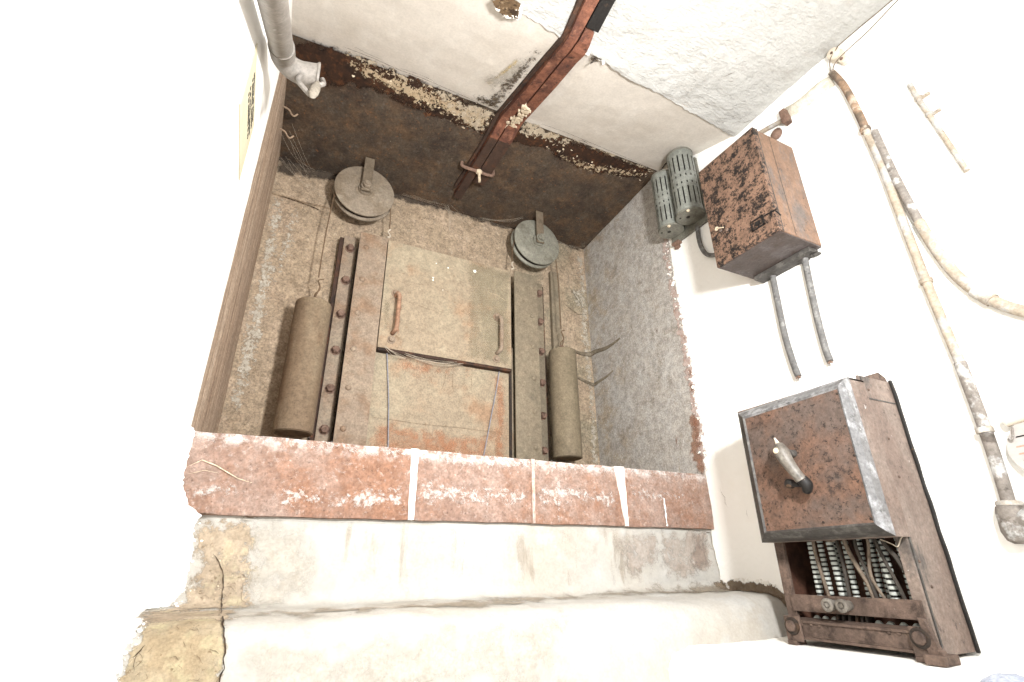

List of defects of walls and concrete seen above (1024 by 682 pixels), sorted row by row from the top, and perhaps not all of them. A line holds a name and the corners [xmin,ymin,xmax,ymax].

spalling [493,0,523,20]
peeling [295,41,496,135]
peeling [513,122,652,181]
rust [690,415,704,474]
peeling [117,517,312,682]
crack [213,554,250,682]